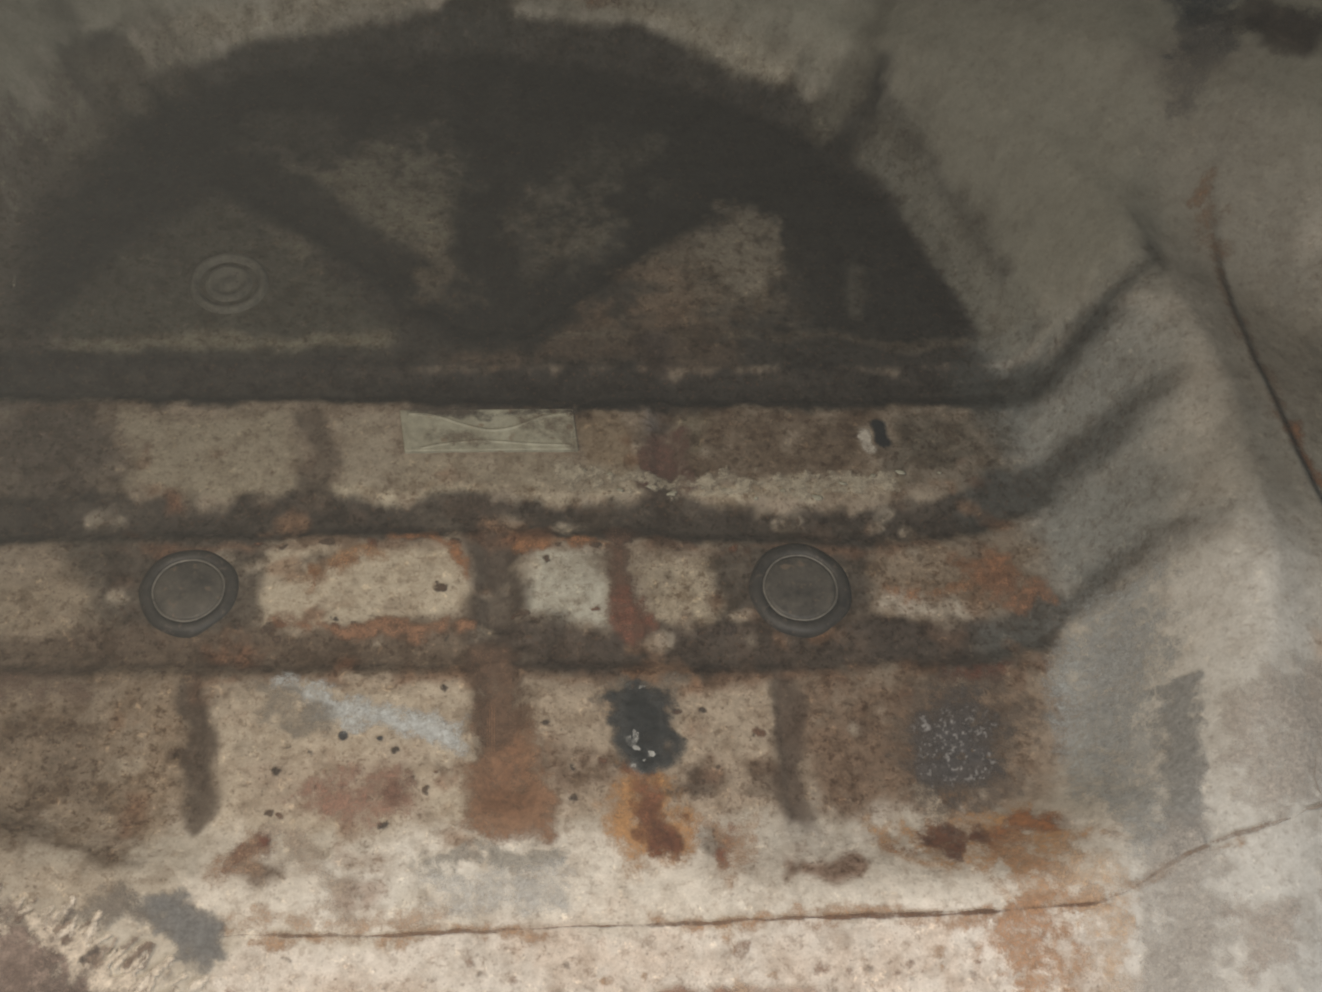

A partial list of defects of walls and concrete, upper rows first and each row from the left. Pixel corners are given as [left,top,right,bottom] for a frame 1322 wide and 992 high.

rust [268,615,477,646]
rust [463,645,560,845]
rust [604,763,698,867]
crack [223,758,1322,938]